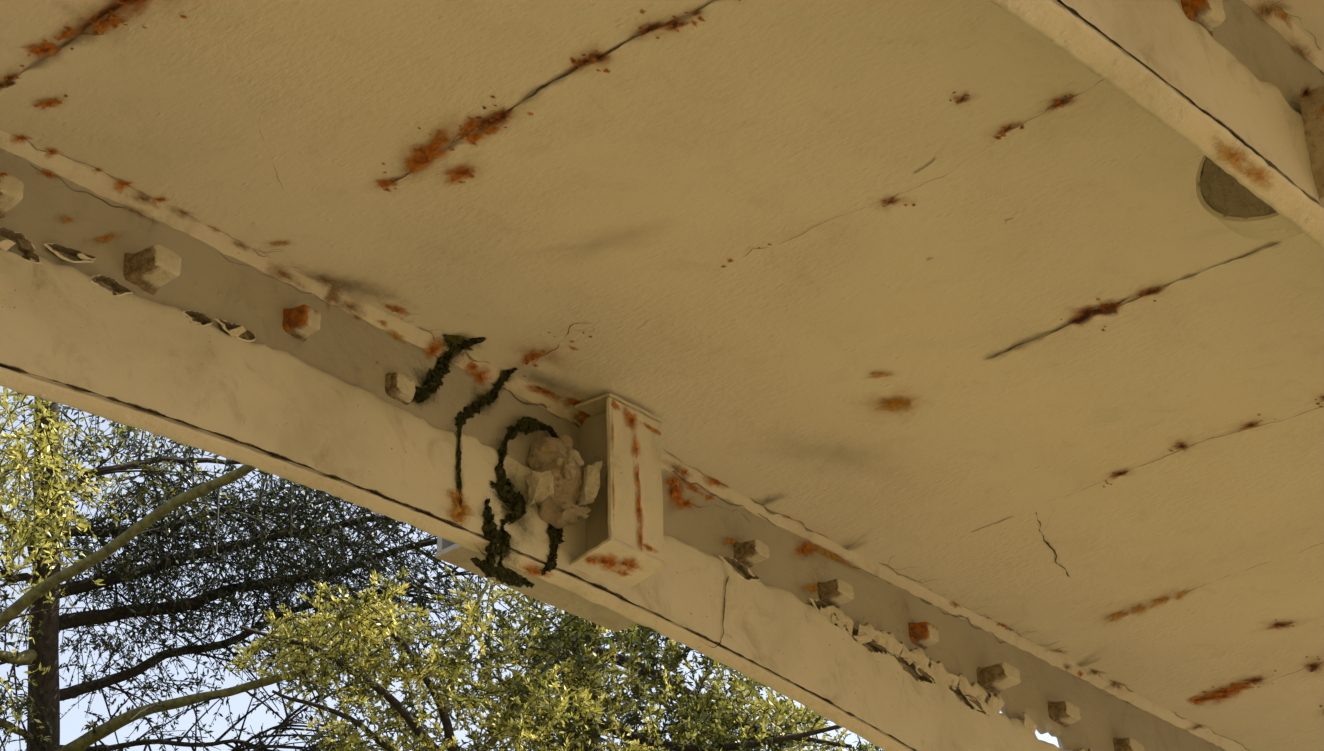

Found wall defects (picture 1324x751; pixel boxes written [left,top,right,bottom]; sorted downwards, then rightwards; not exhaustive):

corrosion [2,0,146,87]
corrosion [571,50,610,73]
corrosion [639,9,704,39]
corrosion [407,95,510,173]
corrosion [1219,146,1269,186]
spalling [0,227,133,296]
crack [0,363,917,751]
corrosion [586,400,661,576]
corrosion [667,465,724,508]
crack [973,475,1114,578]
peeling [810,598,1005,717]
corrosion [1190,670,1276,705]